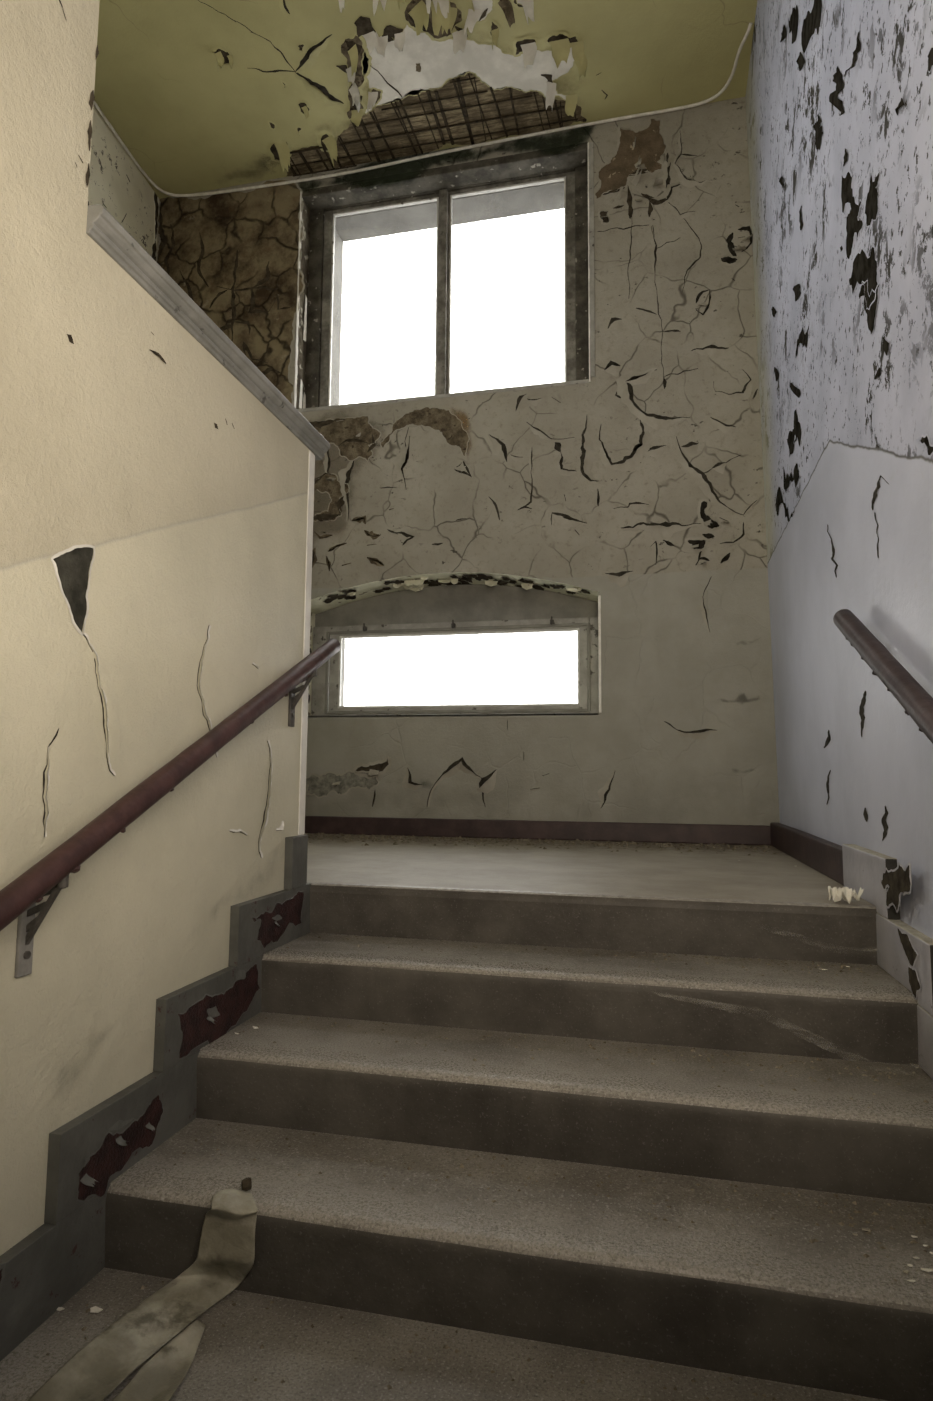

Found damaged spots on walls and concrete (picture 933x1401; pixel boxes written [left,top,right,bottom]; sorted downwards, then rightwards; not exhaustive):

crack [198,0,344,106]
peeling [780,0,822,71]
peeling [829,32,861,116]
spalling [151,0,608,406]
peeling [840,149,889,380]
crack [387,130,758,547]
crack [323,449,354,521]
peeling [774,367,801,522]
spalling [51,544,95,636]
crack [83,633,116,776]
crack [42,728,59,837]
crack [372,720,549,807]